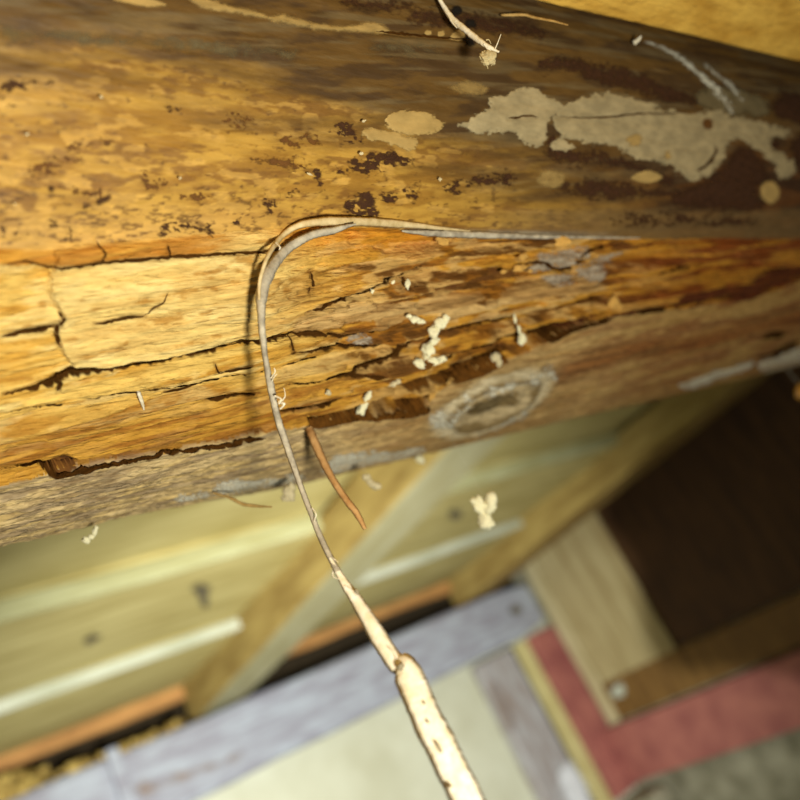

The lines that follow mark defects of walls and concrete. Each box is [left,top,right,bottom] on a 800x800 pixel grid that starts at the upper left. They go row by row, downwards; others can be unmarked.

crack [4,242,279,271]
crack [2,266,613,432]
crack [1,436,264,480]